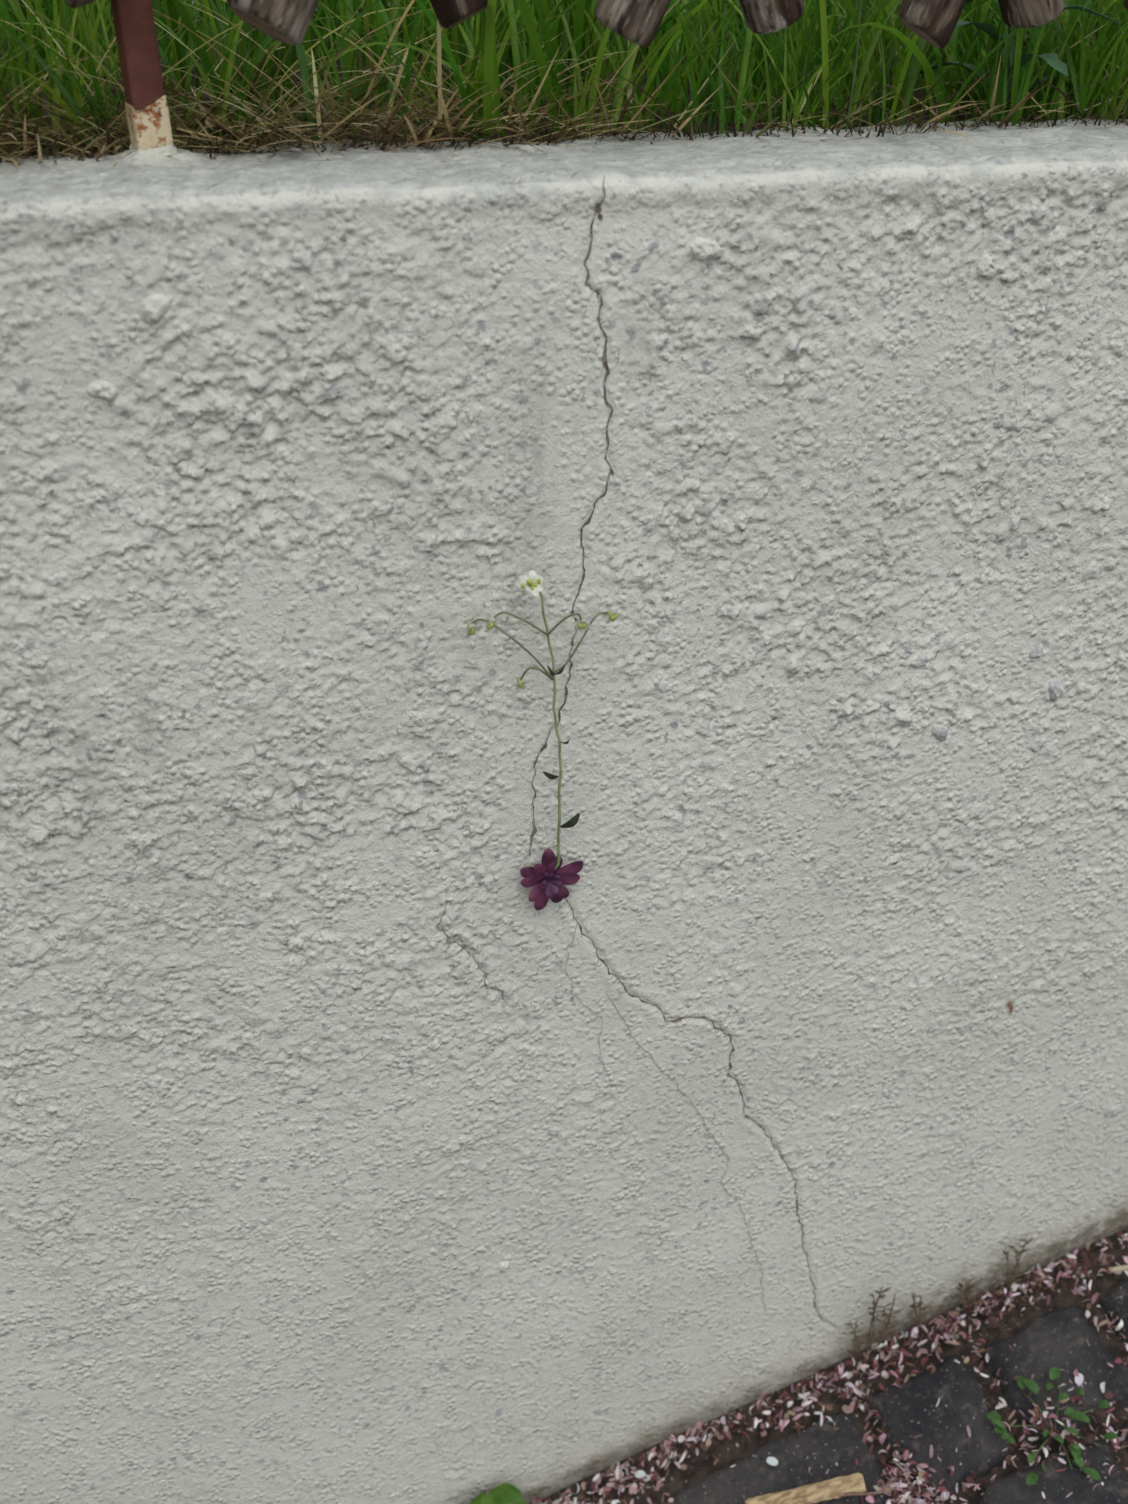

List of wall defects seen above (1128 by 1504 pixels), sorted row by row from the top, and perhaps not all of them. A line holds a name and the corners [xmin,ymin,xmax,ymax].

crack [529,176,614,856]
crack [418,899,833,1325]